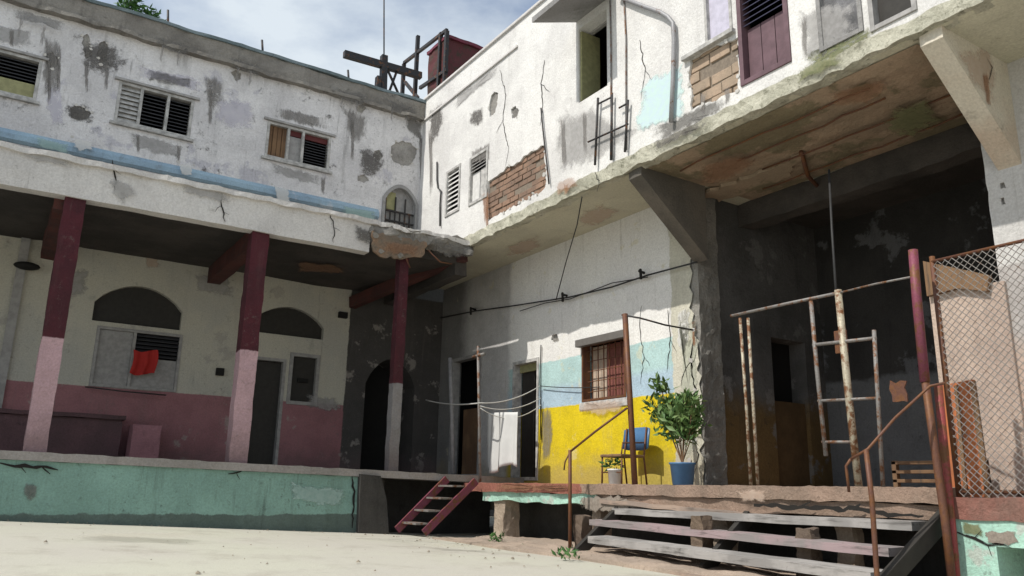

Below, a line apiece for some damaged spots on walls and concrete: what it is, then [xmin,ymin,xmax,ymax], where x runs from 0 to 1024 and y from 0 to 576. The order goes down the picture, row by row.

spalling [80,33,109,66]
leakage [800,5,850,81]
flaking render [488,146,547,219]
spalling [345,207,452,268]
crack [639,306,697,395]
crack [0,462,58,474]
peeling [985,531,1018,546]